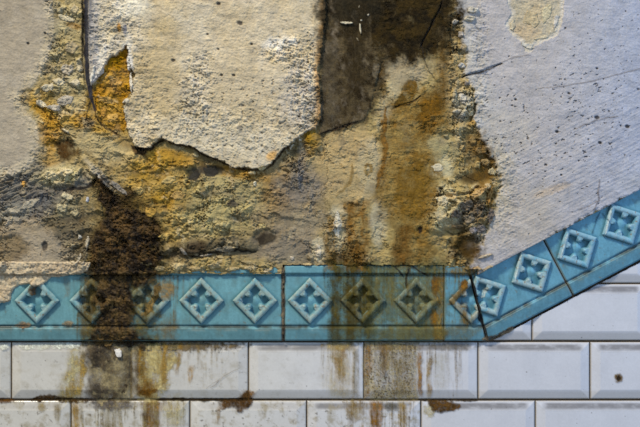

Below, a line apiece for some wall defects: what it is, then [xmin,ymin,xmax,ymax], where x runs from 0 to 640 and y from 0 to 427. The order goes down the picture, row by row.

damp [77,176,178,410]
crack [80,0,294,171]
rust [137,342,254,427]
flaking render [0,0,502,275]
crack [321,121,358,134]
damp [316,0,465,136]
rust [324,202,477,427]
damp [365,73,481,340]
peeling [505,0,564,52]
flaking render [553,205,612,258]